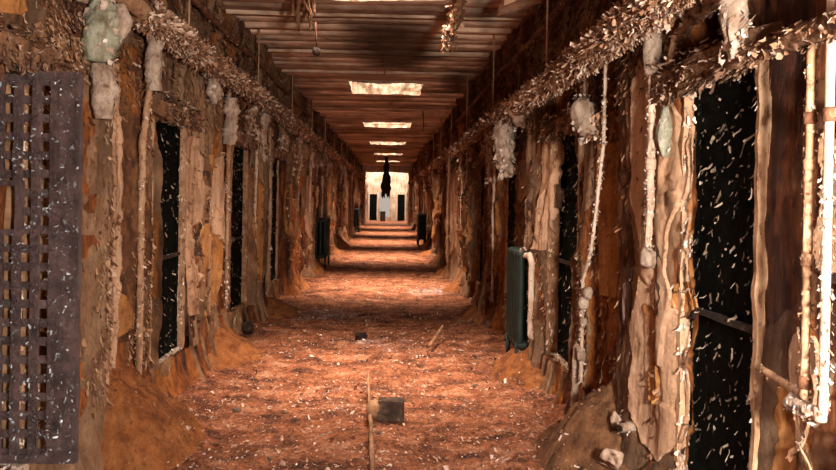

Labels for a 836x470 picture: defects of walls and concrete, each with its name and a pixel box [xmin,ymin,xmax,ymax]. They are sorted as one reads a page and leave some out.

peeling [0,0,362,470]
peeling [411,0,836,470]